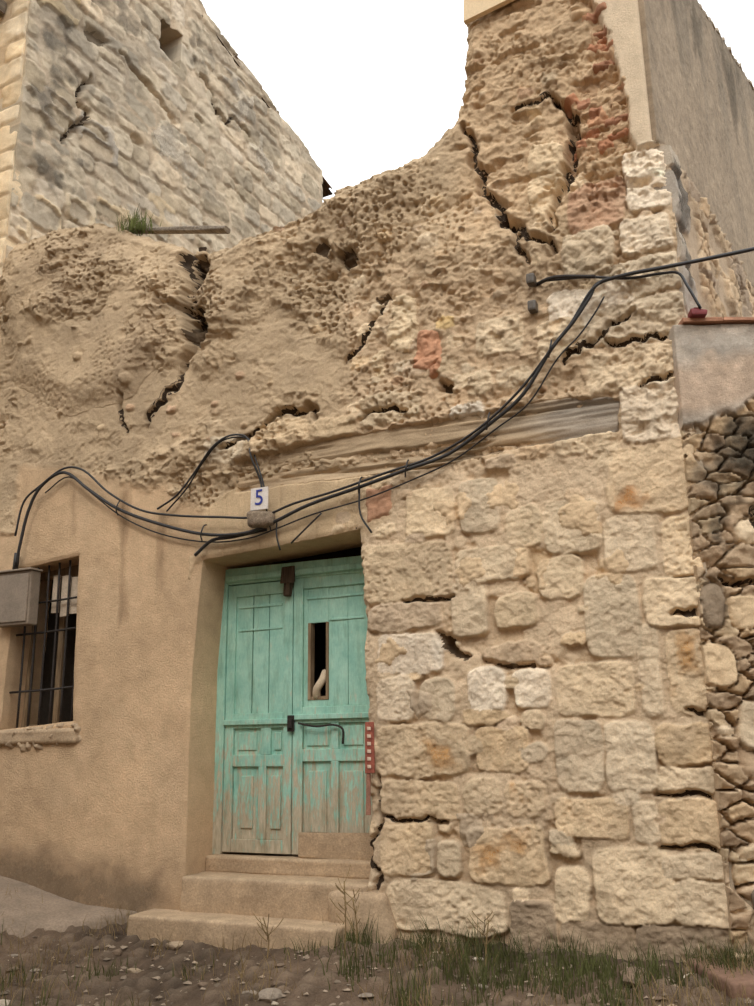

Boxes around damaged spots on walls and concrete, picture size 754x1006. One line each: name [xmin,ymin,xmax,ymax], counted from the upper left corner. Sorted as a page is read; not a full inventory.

spalling [83,30,105,47]
flaking render [526,0,632,229]
crack [464,90,587,263]
crack [176,247,208,331]
spalling [197,254,210,288]
spalling [314,243,331,259]
spalling [343,248,359,271]
spalling [181,328,208,348]
peeling [370,294,454,394]
crack [118,364,190,433]